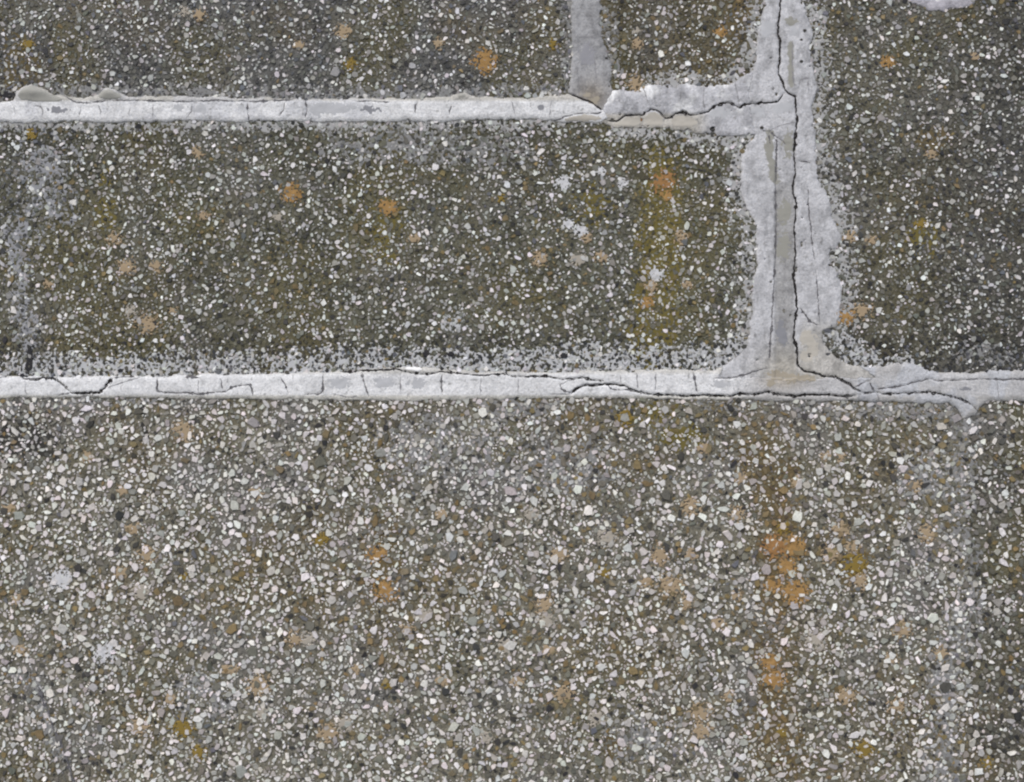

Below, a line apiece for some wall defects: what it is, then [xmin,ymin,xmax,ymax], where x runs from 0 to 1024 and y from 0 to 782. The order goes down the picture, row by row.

crack [0,374,253,396]
crack [281,0,1024,410]